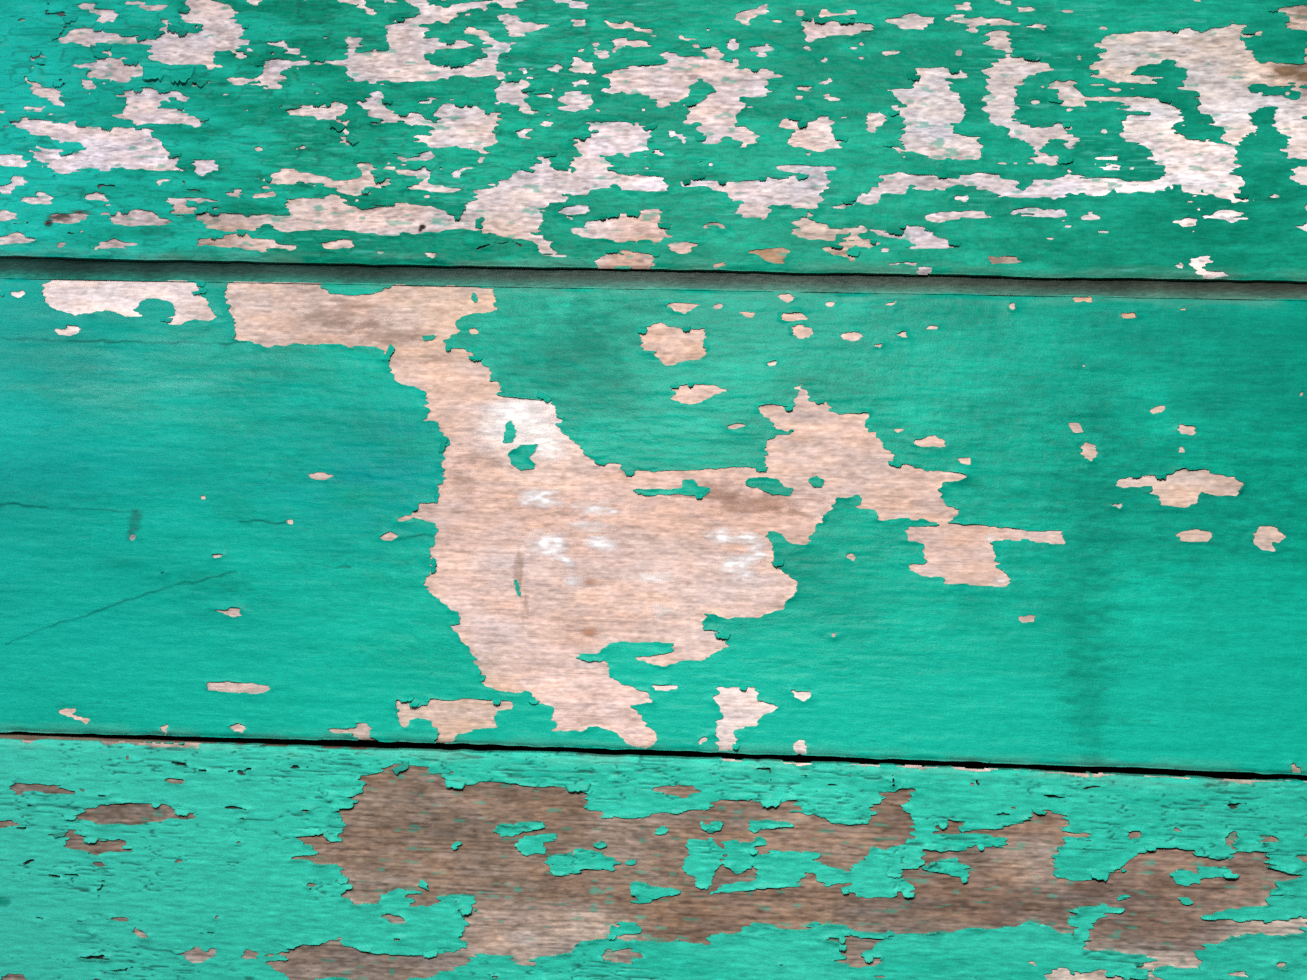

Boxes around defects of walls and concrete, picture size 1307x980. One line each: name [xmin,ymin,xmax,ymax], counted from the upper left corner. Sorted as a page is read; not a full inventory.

peeling [0,0,1307,275]
peeling [1189,256,1229,279]
peeling [1177,424,1196,435]
peeling [1116,468,1244,508]
peeling [42,279,1065,750]
peeling [1175,529,1212,542]
peeling [1253,526,1286,551]
peeling [782,740,812,766]
peeling [241,761,1307,980]
peeling [112,917,148,937]
peeling [178,947,217,963]